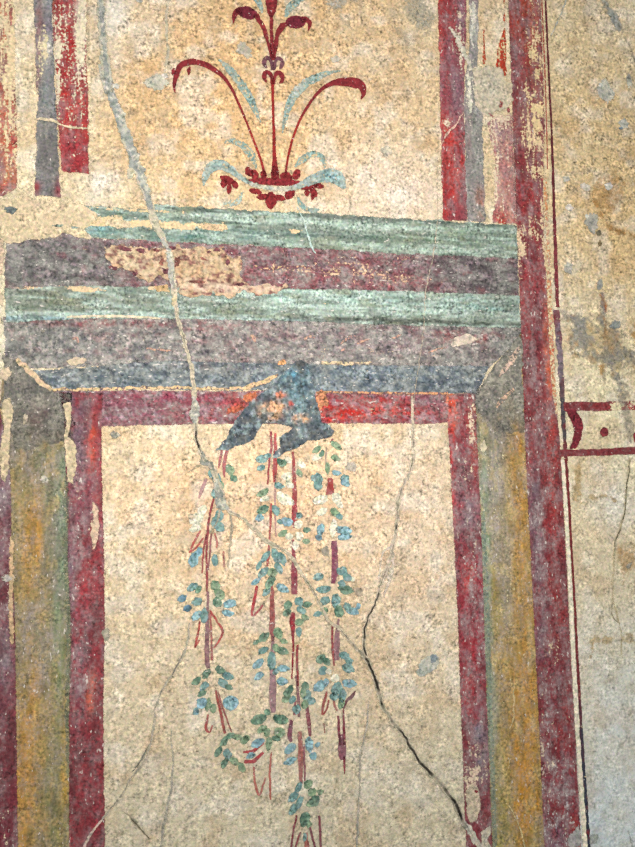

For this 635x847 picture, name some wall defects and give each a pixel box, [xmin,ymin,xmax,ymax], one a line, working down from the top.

peeling [472,65,514,117]
peeling [104,244,288,299]
crack [83,0,483,847]
crack [611,458,631,657]
crack [508,684,516,729]
crack [506,803,525,847]